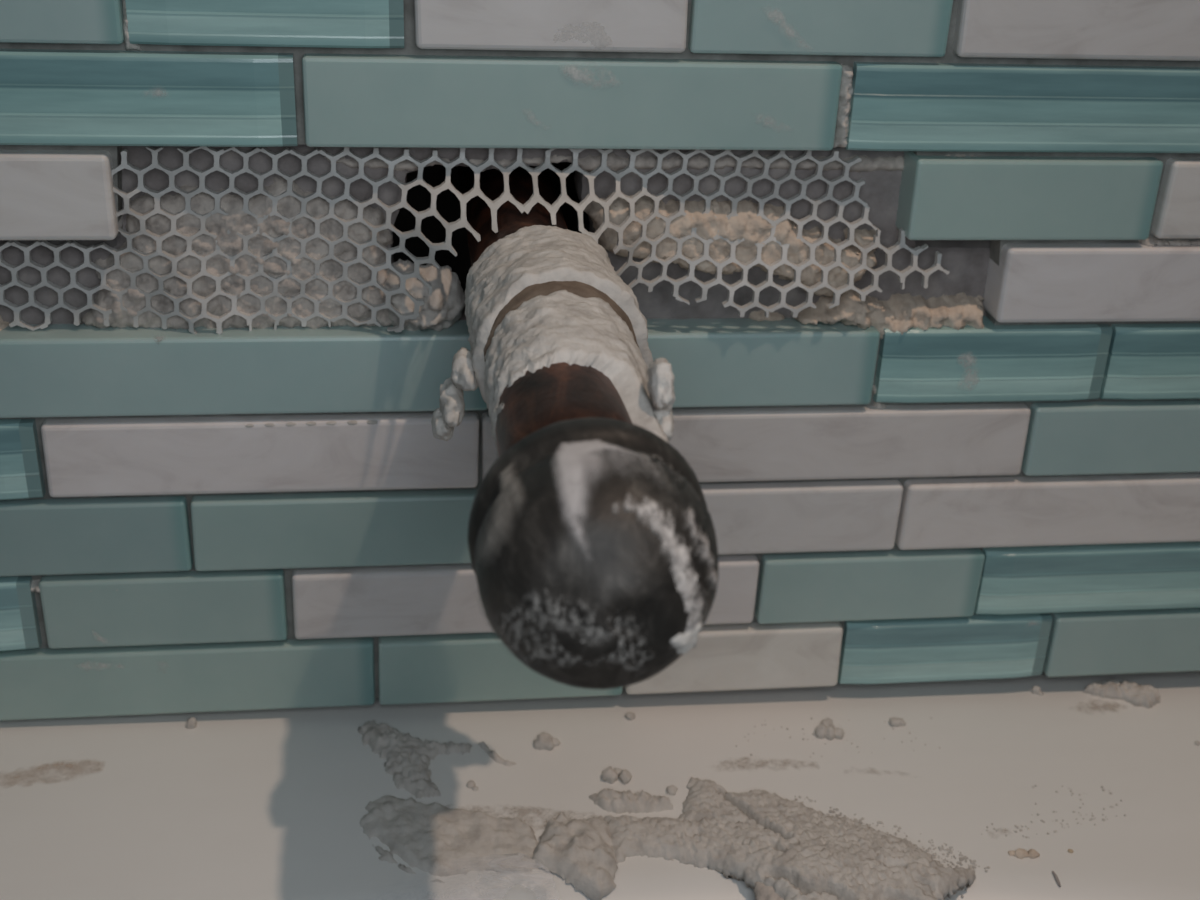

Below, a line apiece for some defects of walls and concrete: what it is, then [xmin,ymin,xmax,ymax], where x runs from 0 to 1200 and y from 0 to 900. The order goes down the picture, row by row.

peeling [0,144,990,325]